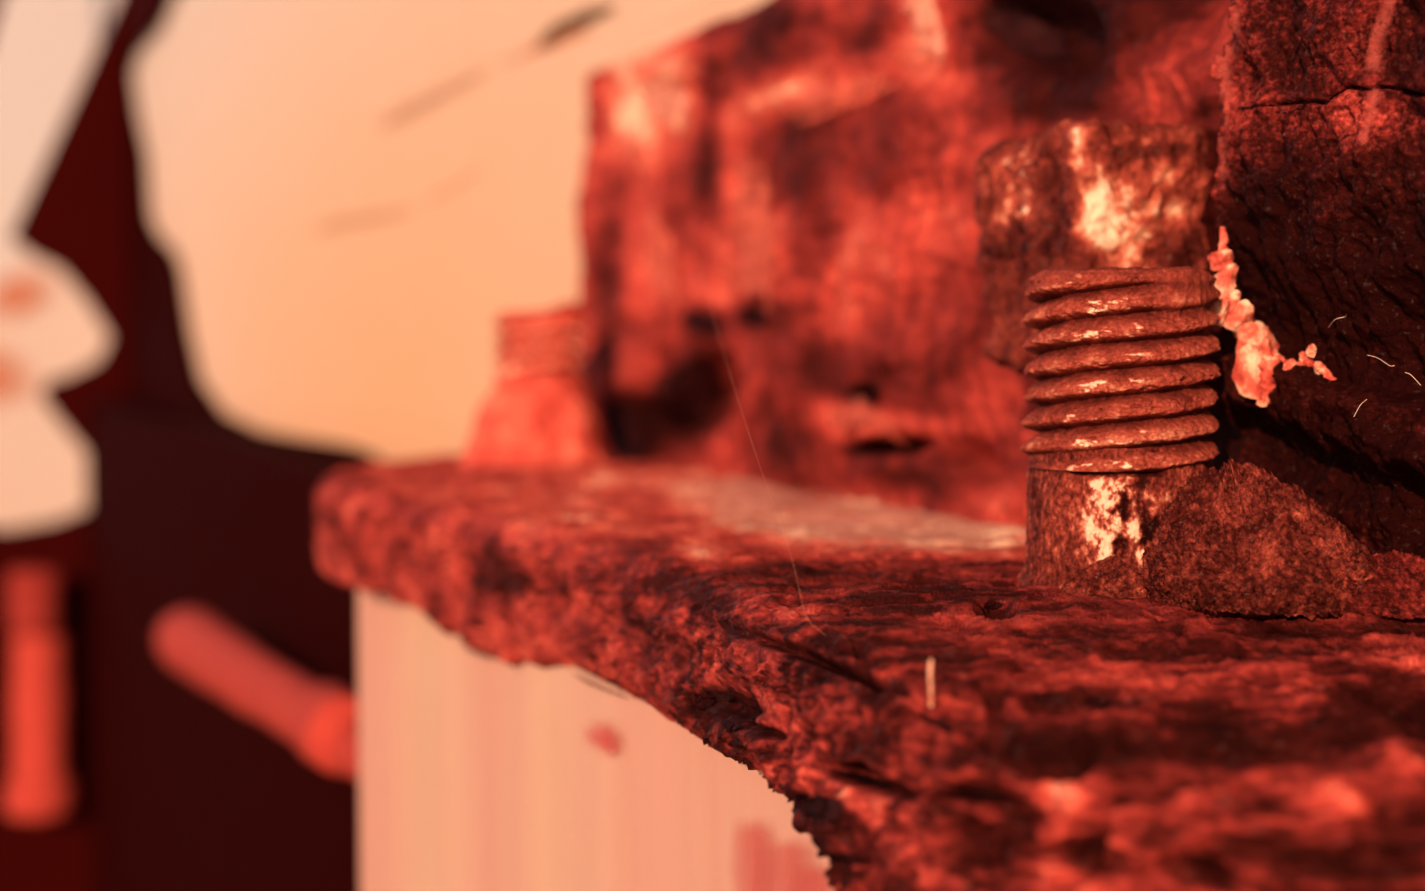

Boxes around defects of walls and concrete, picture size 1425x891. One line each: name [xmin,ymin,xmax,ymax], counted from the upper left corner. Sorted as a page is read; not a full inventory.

crack [1238,86,1425,114]